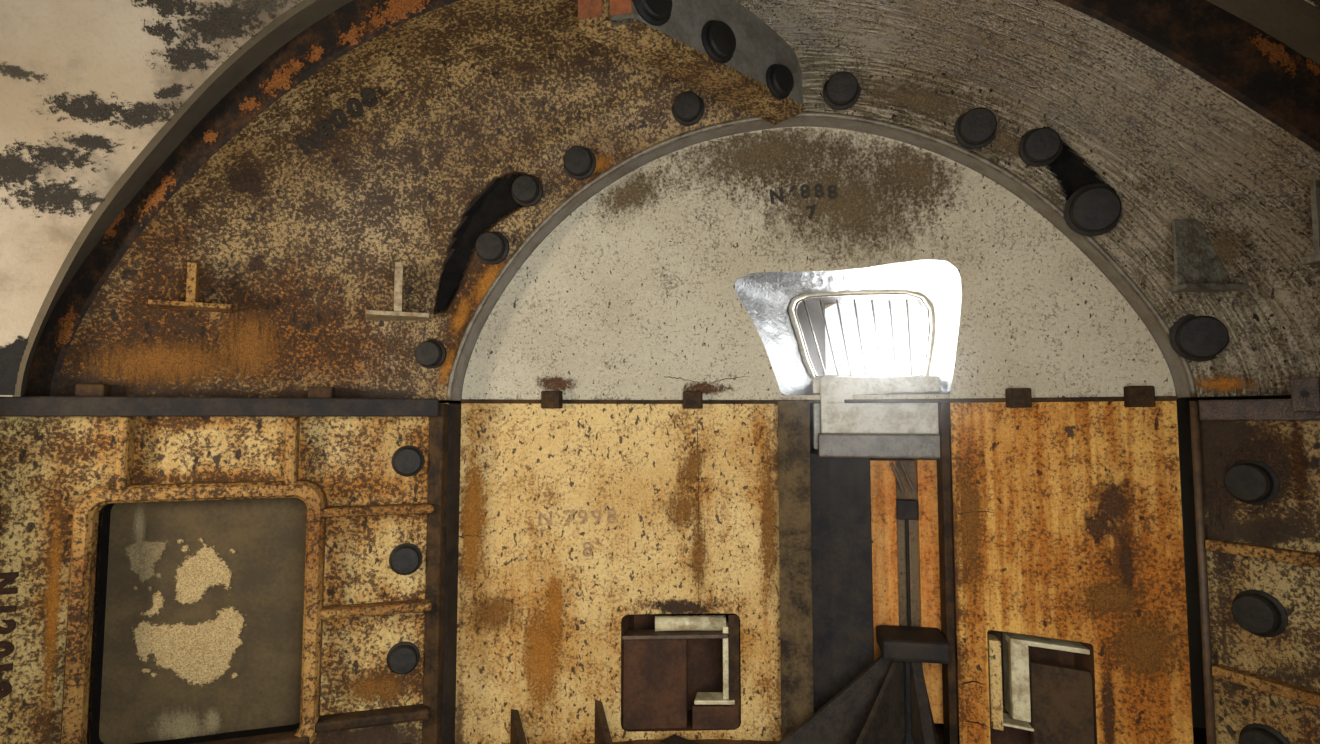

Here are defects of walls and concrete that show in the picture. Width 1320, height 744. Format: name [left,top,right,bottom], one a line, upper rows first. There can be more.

peeling [202,128,219,145]
peeling [102,169,178,244]
corrosion [451,263,504,333]
corrosion [83,310,281,390]
corrosion [537,376,575,391]
corrosion [663,447,707,586]
corrosion [760,438,778,622]
corrosion [1081,476,1135,594]
peeling [125,537,247,687]
corrosion [462,453,564,713]
corrosion [645,599,721,614]
corrosion [1101,659,1115,744]